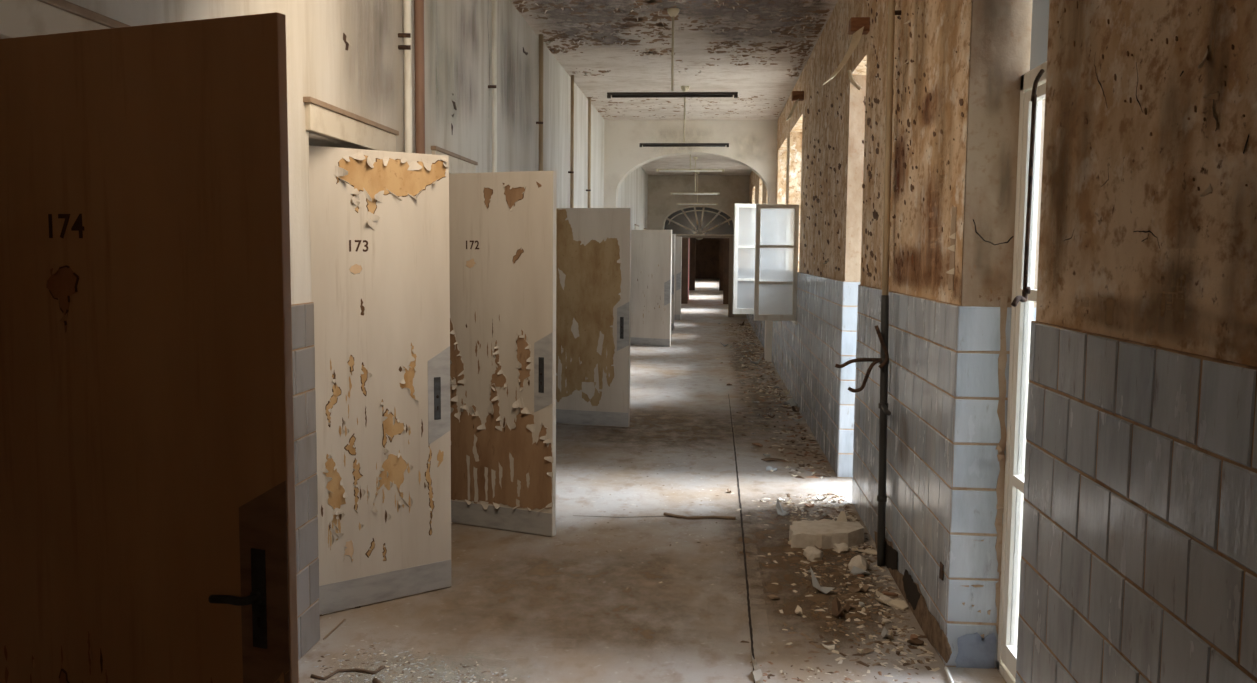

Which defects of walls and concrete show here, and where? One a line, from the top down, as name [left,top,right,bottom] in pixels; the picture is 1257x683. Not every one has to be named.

peeling [513,0,830,78]
peeling [586,95,785,118]
peeling [335,150,450,230]
peeling [483,179,542,211]
peeling [861,47,932,281]
crack [973,219,1014,245]
peeling [556,209,623,406]
peeling [321,312,554,562]